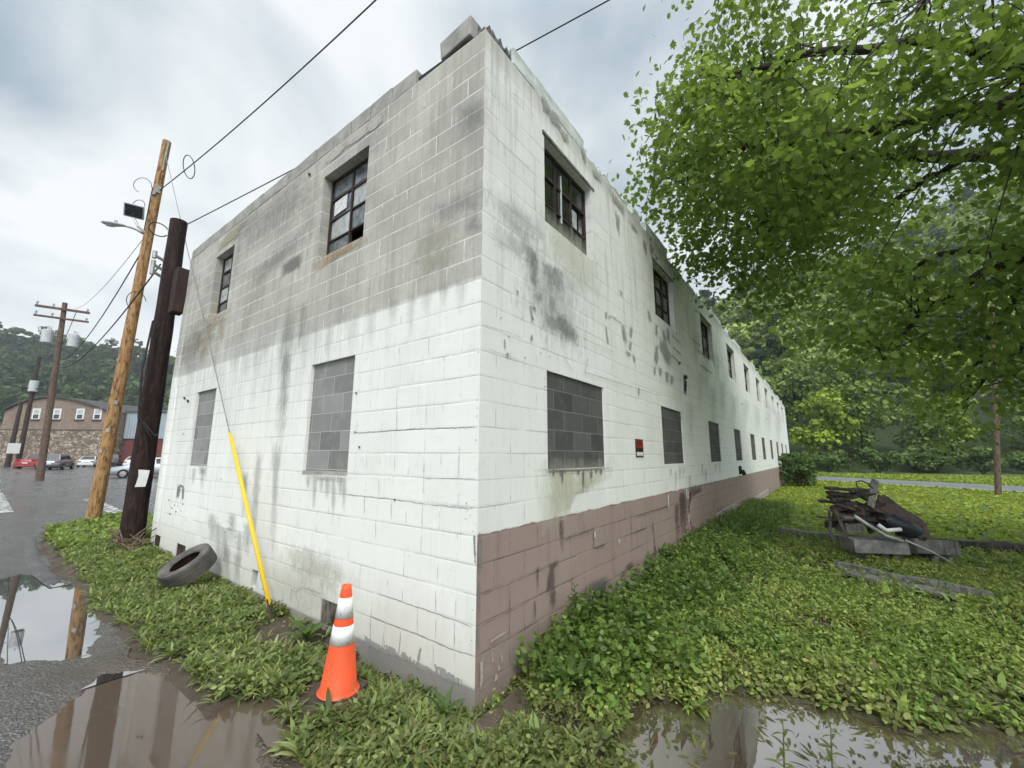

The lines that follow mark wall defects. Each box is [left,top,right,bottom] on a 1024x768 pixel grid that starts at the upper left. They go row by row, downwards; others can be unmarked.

damp [284,255,299,273]
damp [527,247,575,339]
peeling [605,312,635,362]
peeling [648,310,674,385]
damp [550,468,602,487]
damp [676,488,700,528]
damp [537,562,557,605]